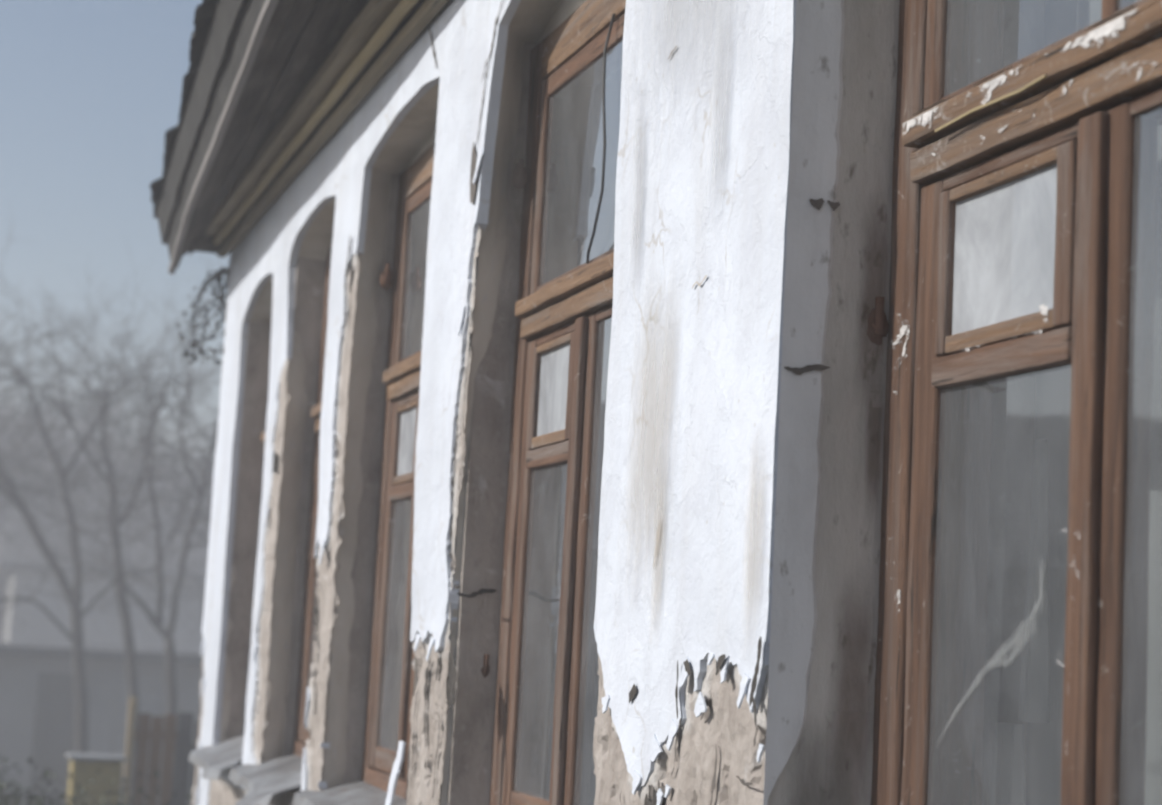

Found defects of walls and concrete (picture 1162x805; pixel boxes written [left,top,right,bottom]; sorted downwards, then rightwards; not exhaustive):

flaking render [191,764,247,805]
flaking render [252,358,290,765]
flaking render [269,254,360,805]
flaking render [385,224,481,805]
flaking render [593,0,1156,805]